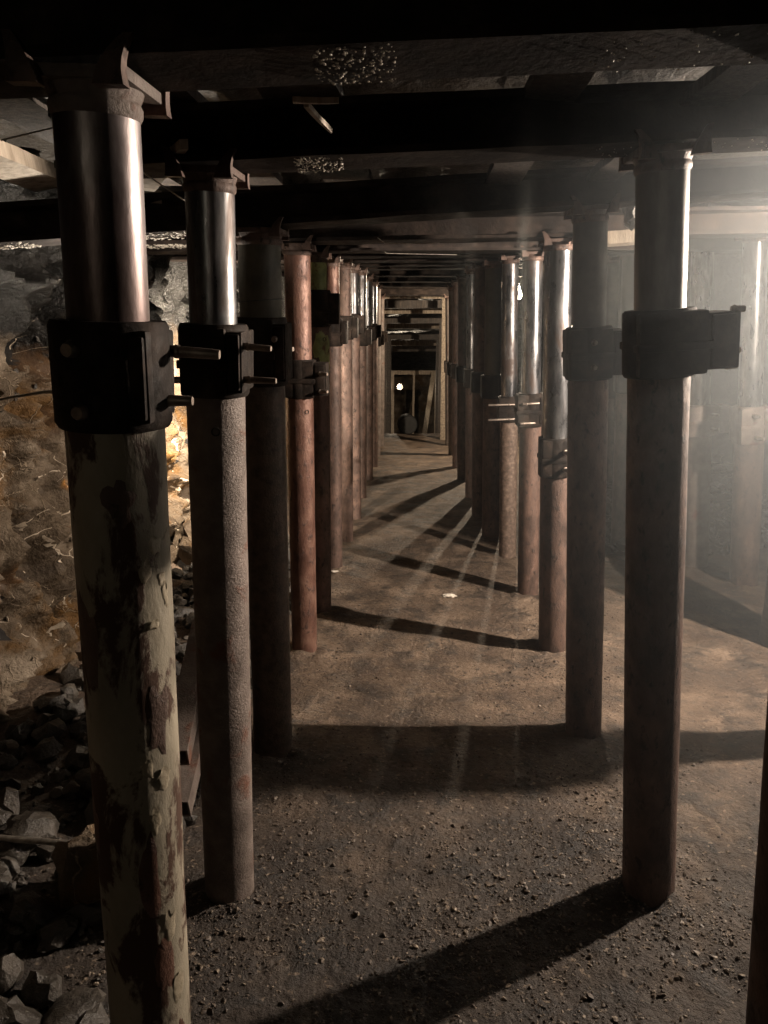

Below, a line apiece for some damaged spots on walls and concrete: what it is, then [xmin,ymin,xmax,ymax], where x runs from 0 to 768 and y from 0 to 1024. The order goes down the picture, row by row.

rust [78,591,98,689]
rust [149,683,168,754]
peeling [142,758,171,790]
rust [138,831,161,918]
peeling [163,909,176,942]
rust [154,937,175,991]